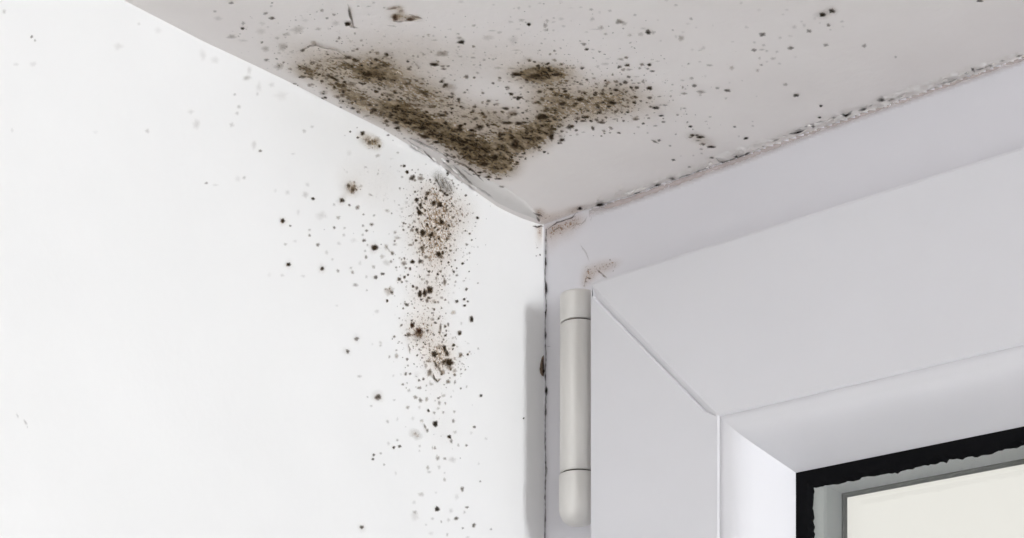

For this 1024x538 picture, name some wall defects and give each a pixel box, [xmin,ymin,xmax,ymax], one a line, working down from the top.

water stain [266,9,702,431]
flaking render [583,51,1024,210]